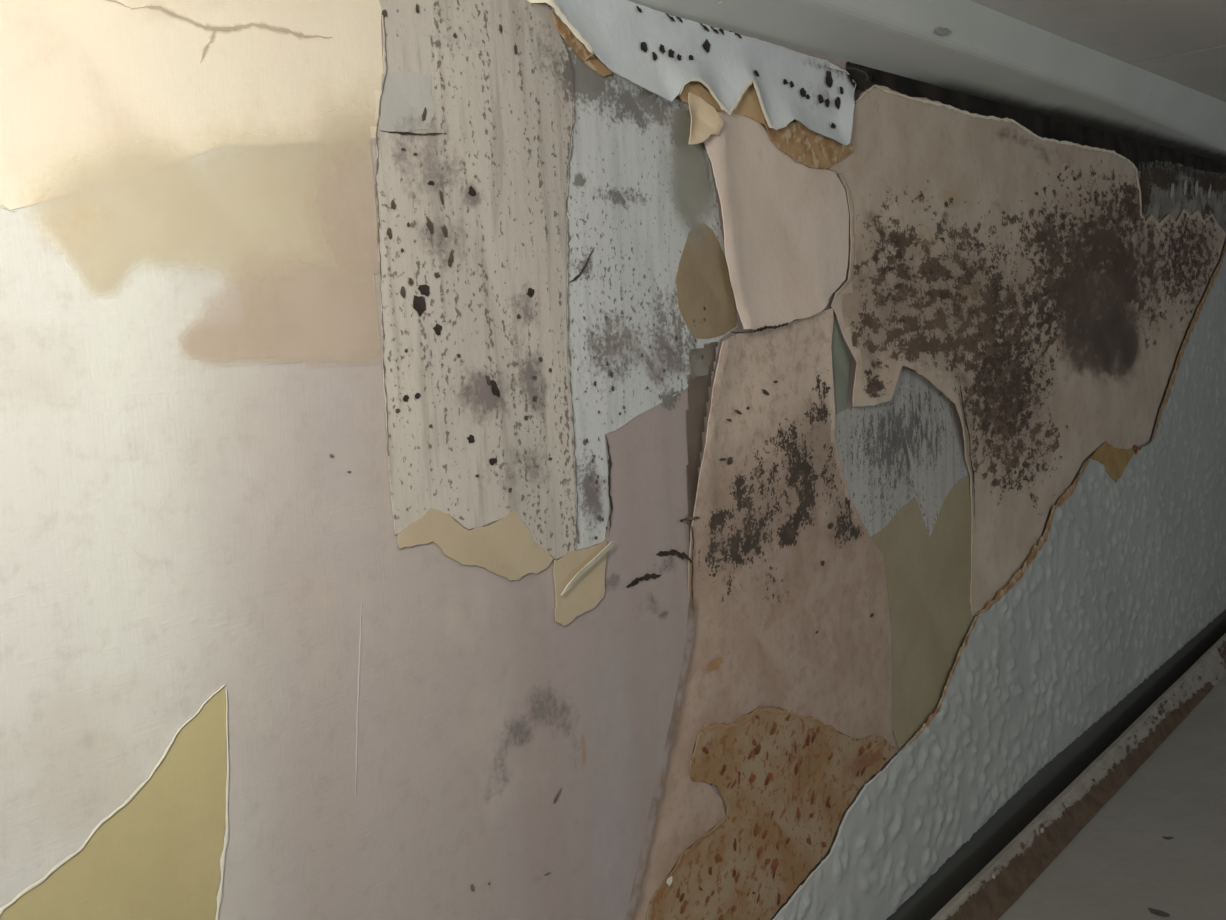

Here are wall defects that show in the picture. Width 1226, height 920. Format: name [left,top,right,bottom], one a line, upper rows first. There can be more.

crack [108,0,331,63]
leakage [641,23,742,61]
leakage [47,117,392,361]
leakage [400,216,454,317]
flaking render [375,0,738,626]
leakage [783,61,1226,515]
flaking render [1138,160,1226,232]
leakage [583,306,864,601]
peeling [831,320,975,749]
peeling [0,685,229,920]
corrosion [646,706,896,920]
peeling [940,640,1226,920]